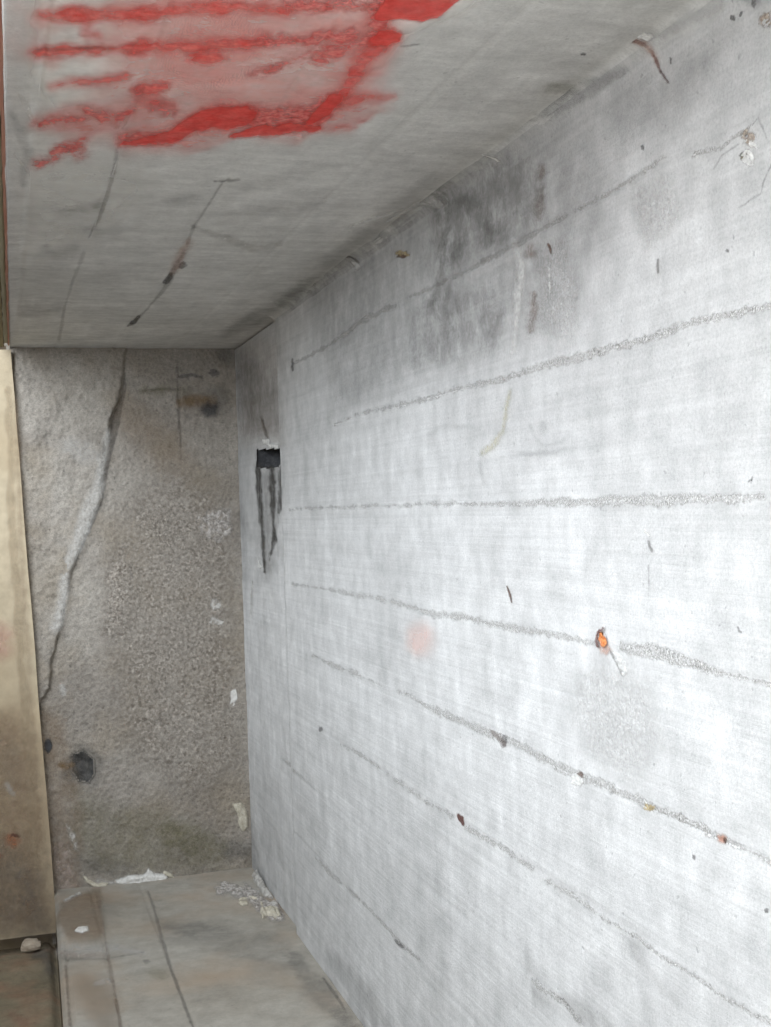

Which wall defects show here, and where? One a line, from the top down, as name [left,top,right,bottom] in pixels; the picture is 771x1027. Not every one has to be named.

crack [163,263,185,284]
water stain [255,465,282,573]